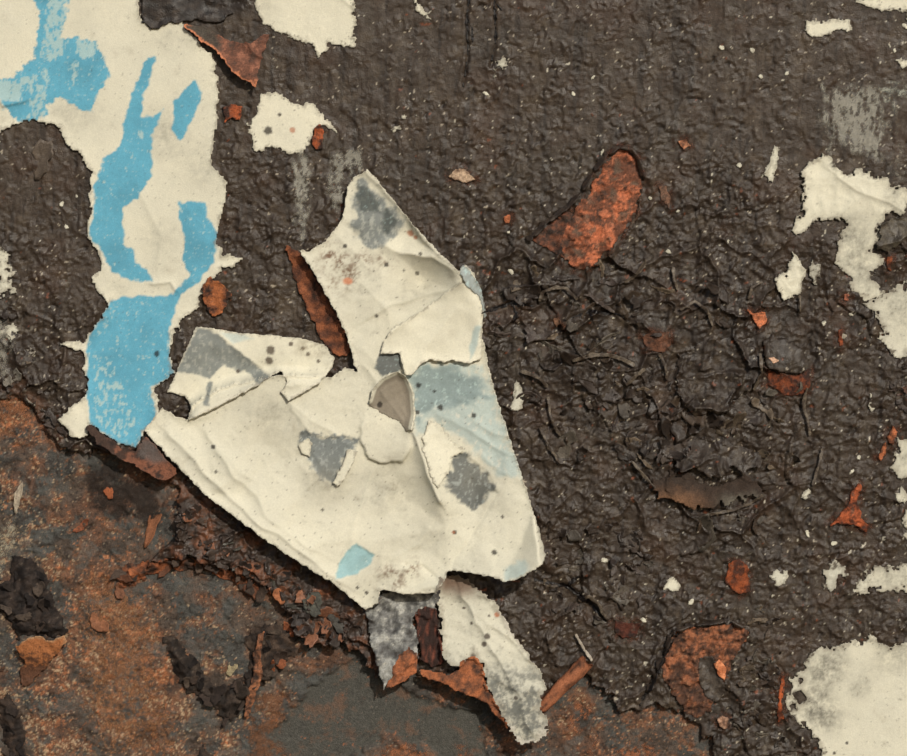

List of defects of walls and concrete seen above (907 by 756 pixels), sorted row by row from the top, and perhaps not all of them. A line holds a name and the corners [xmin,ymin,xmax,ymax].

rust [184,24,269,87]
rust [525,144,646,276]
crack [481,301,534,323]
crack [564,308,637,329]
peeling [0,347,68,442]
rust [0,526,68,686]
rust [109,553,285,605]
peeling [173,504,369,648]
crack [534,576,606,622]
rust [162,621,299,727]
rust [646,615,750,729]
rust [0,693,28,756]